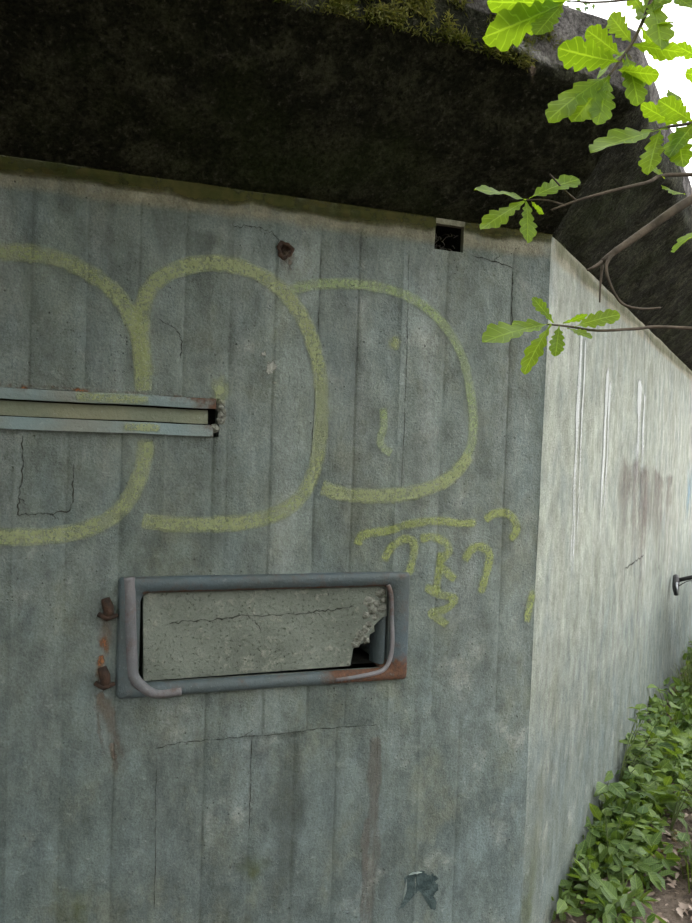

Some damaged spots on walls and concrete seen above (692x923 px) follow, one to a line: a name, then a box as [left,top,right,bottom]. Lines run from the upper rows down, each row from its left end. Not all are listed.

crack [17,437,74,519]
crack [170,605,353,633]
spalling [351,589,386,648]
crack [158,724,378,828]
crack [151,771,159,906]